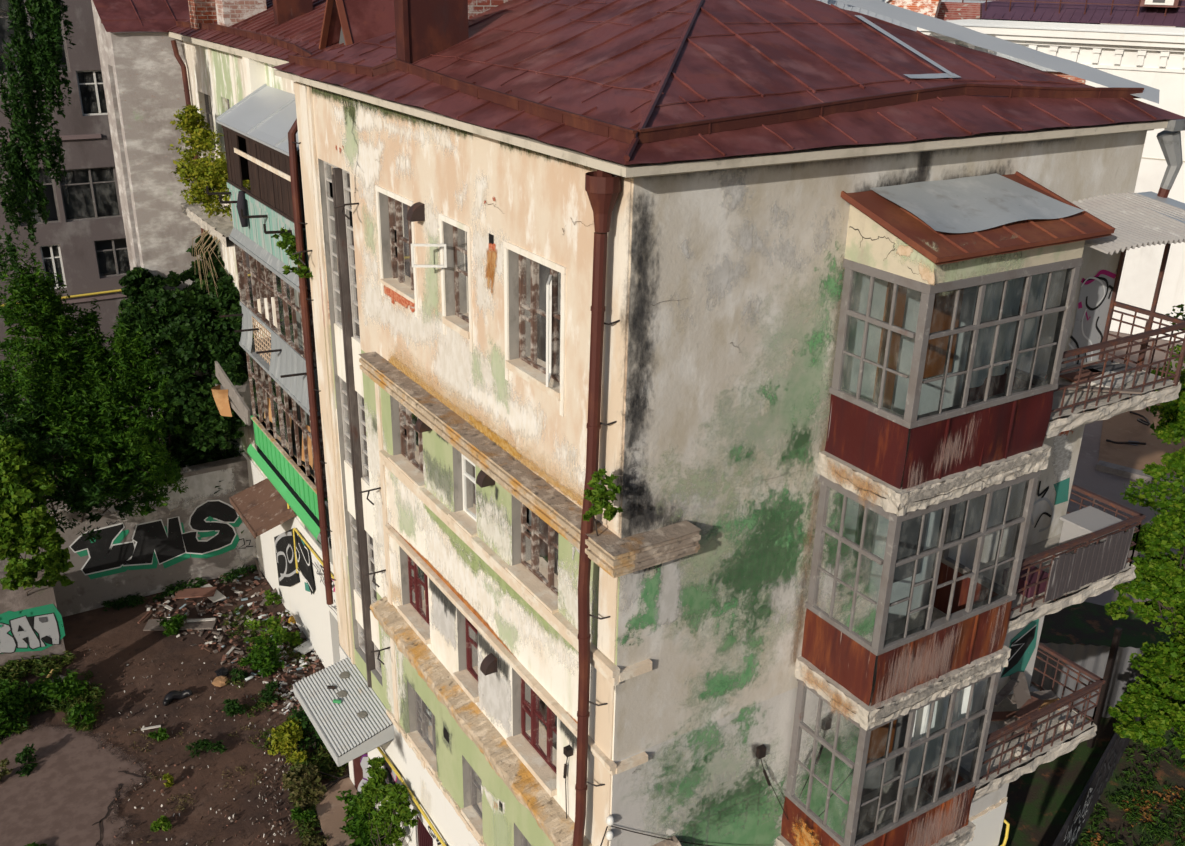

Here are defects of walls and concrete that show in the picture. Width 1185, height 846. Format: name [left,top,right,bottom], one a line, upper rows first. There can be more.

peeling [384,237,438,318]
rust [486,250,497,293]
crack [849,226,935,274]
peeling [472,346,508,407]
water stain [627,396,645,447]
water stain [617,461,647,497]
rust [831,467,877,500]
water stain [621,560,681,625]
water stain [772,480,818,662]
peeling [381,629,405,719]
peeling [477,648,512,737]
rust [791,822,819,846]